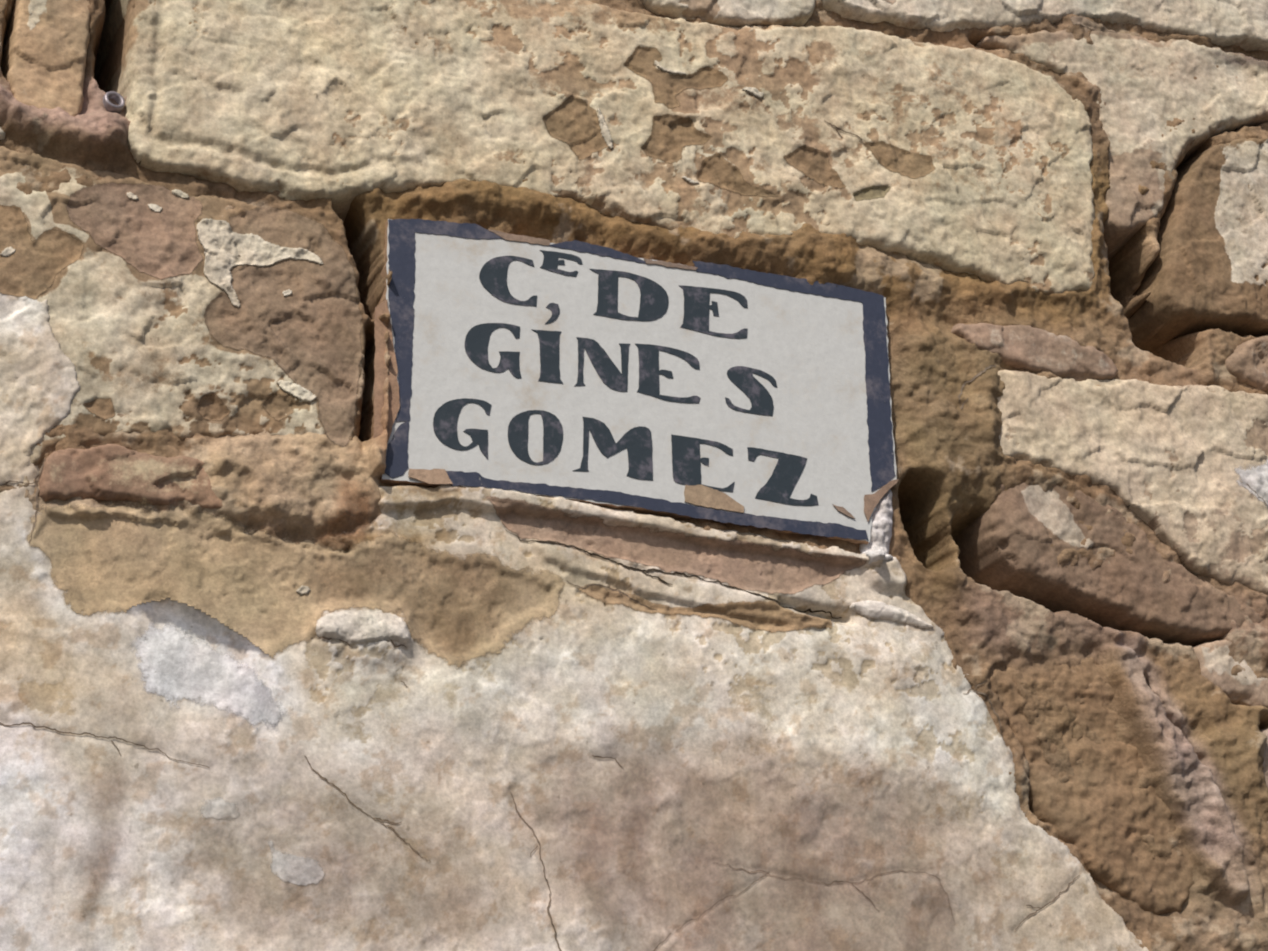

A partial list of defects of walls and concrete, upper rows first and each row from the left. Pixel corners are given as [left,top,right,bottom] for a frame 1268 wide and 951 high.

peeling [0,182,363,447]
peeling [27,498,565,667]
peeling [486,496,867,633]
crack [0,722,209,768]
crack [305,756,431,863]
crack [511,794,562,951]
crack [653,863,955,951]